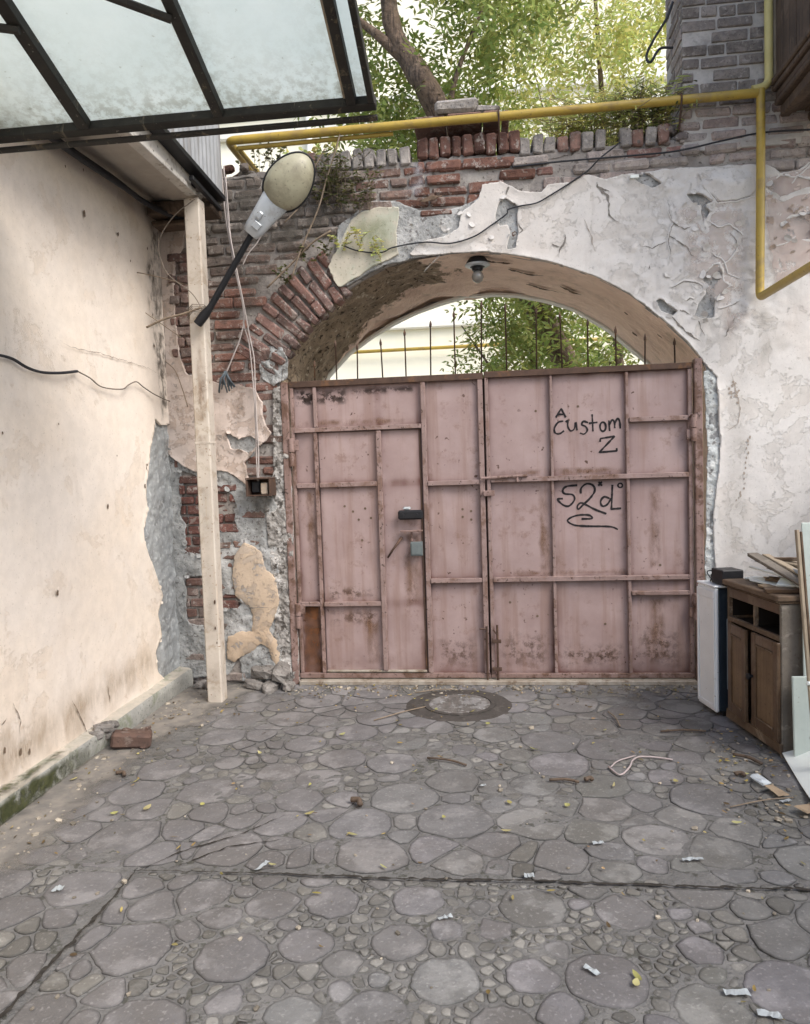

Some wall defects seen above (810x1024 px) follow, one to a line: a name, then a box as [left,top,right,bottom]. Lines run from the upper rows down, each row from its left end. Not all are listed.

flaking render [488,195,518,246]
crack [552,184,616,253]
crack [646,201,702,268]
crack [671,308,735,340]
flaking render [703,370,740,580]
flaking render [224,346,300,681]
flaking render [144,421,244,677]